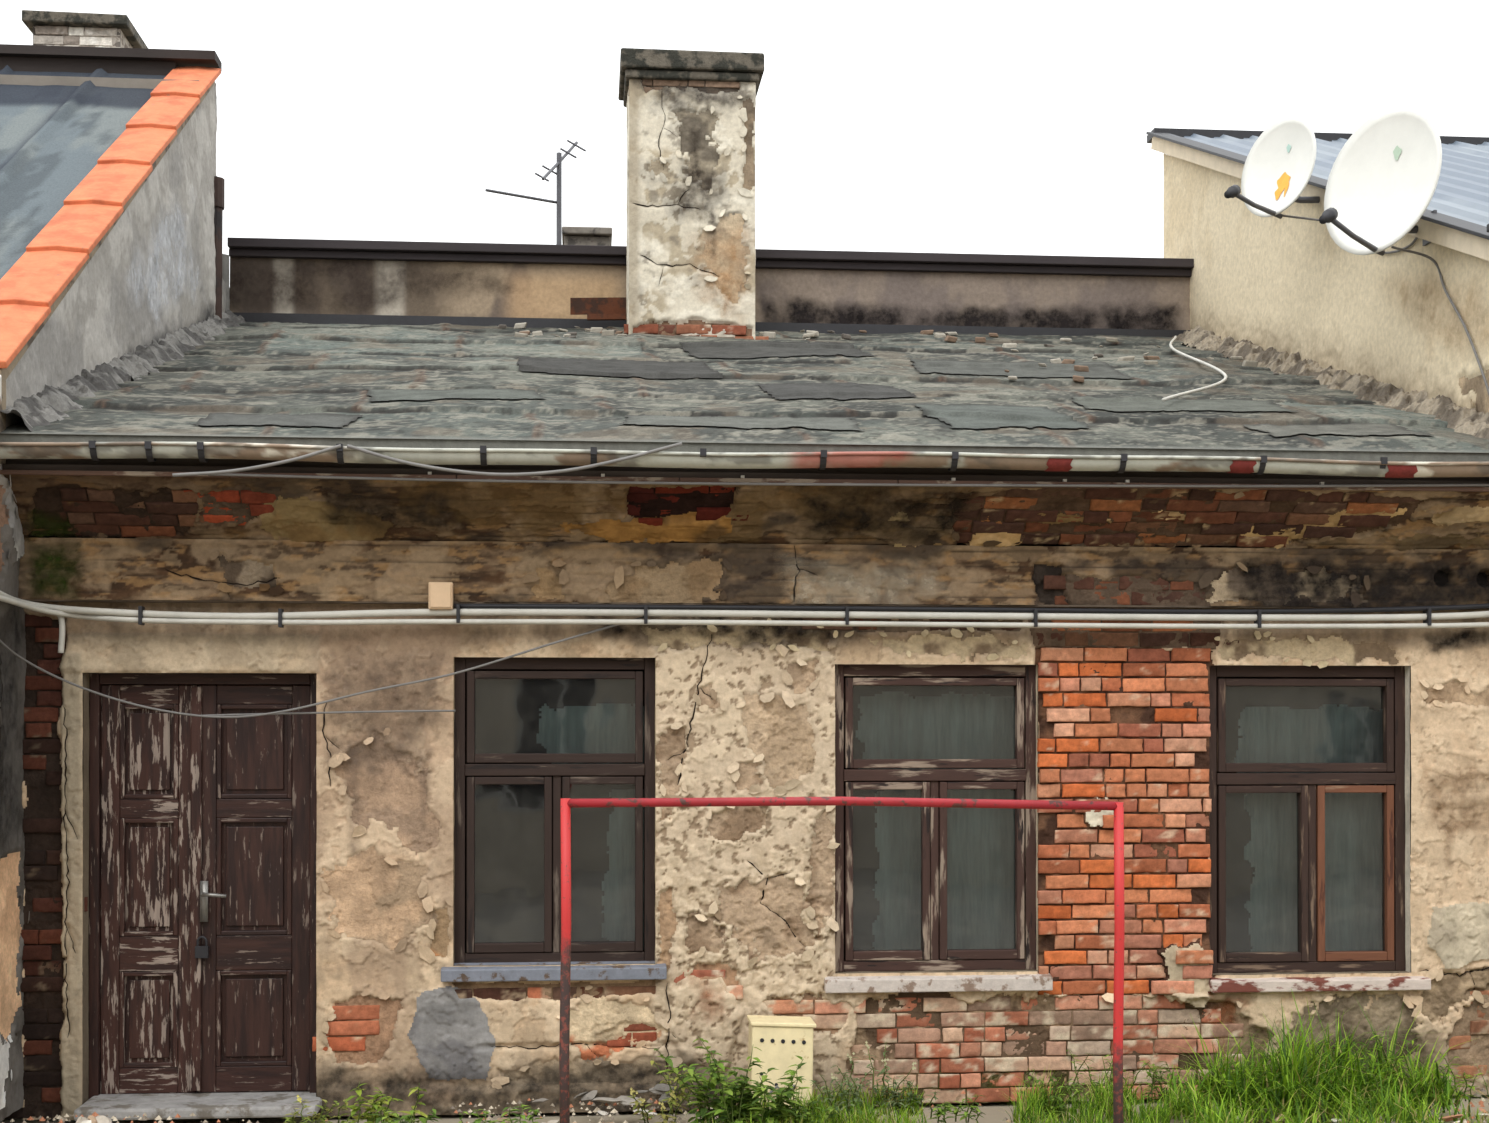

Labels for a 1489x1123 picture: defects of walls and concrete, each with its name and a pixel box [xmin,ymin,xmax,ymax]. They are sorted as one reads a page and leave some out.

crack [633,108,701,210]
crack [641,255,719,284]
peeling [628,79,755,303]
flaking render [624,320,769,340]
flaking render [0,475,276,571]
flaking render [0,613,112,1123]
flaking render [312,992,403,1065]
peeling [319,728,453,964]
flaking render [448,806,840,1090]
flaking render [627,482,1489,1122]